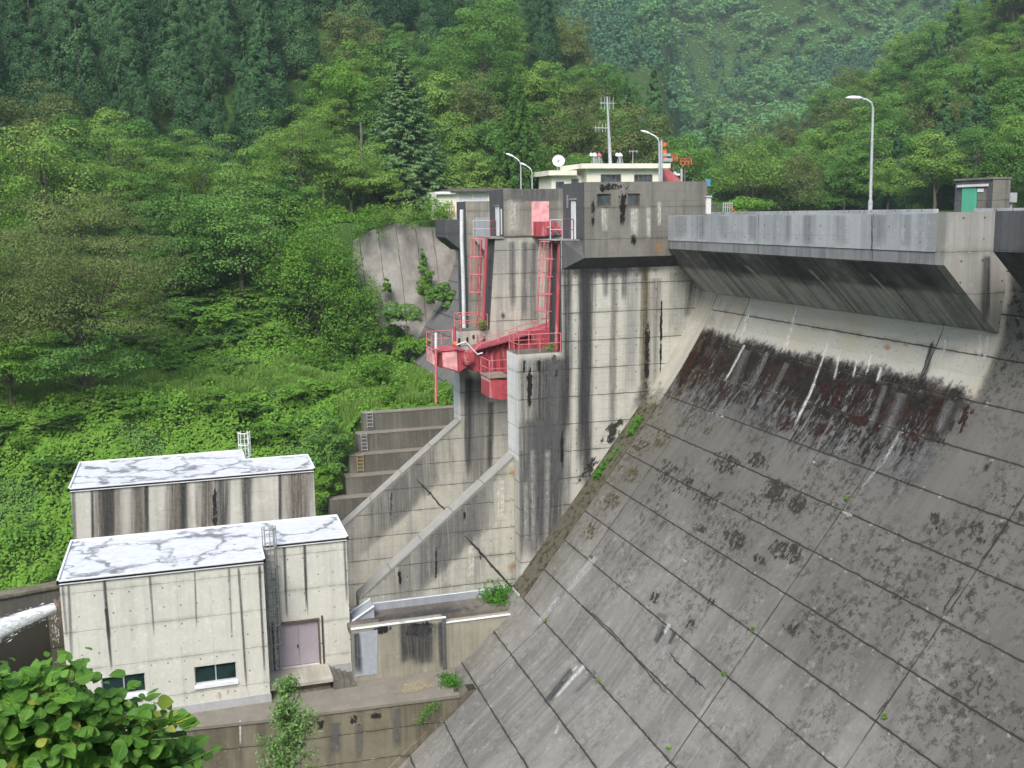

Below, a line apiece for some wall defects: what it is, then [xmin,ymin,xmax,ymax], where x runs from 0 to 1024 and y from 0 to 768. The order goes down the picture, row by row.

water stain [922,344,934,376]
water stain [520,267,663,547]
water stain [91,488,117,538]
water stain [132,486,148,534]
water stain [170,482,186,530]
water stain [201,479,228,527]
water stain [242,477,251,523]
water stain [279,473,309,520]
crack [416,479,445,510]
crack [464,536,512,586]
water stain [400,608,460,665]
crack [670,652,706,690]